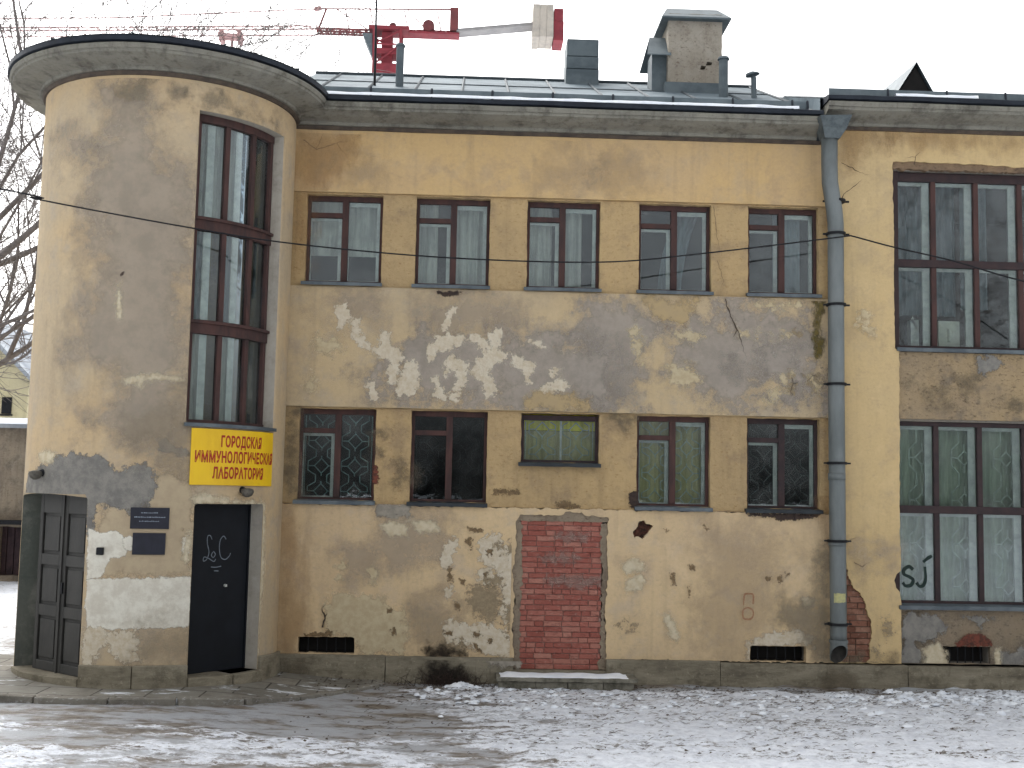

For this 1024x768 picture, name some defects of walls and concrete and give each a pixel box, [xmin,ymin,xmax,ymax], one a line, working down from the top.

crack [713,206,745,353]
peeling [333,290,571,403]
peeling [38,450,55,465]
peeling [86,528,133,580]
peeling [181,533,192,563]
peeling [191,493,266,624]
spalling [633,521,669,538]
peeling [81,626,142,665]
peeling [380,519,522,670]
flaking render [843,569,896,662]
peeling [923,614,1024,665]